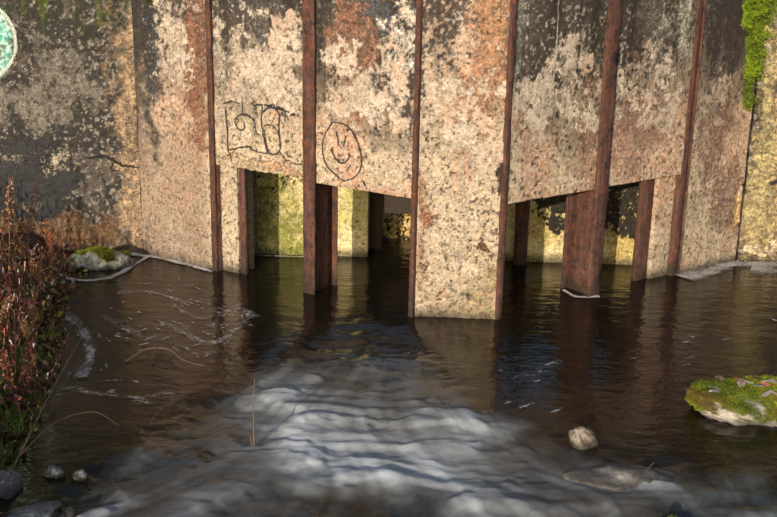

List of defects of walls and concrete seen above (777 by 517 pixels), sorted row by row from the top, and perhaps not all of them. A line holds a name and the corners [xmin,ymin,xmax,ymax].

water stain [109,0,164,245]
corrosion [185,0,208,150]
corrosion [324,0,379,86]
corrosion [457,0,511,135]
water stain [637,0,693,62]